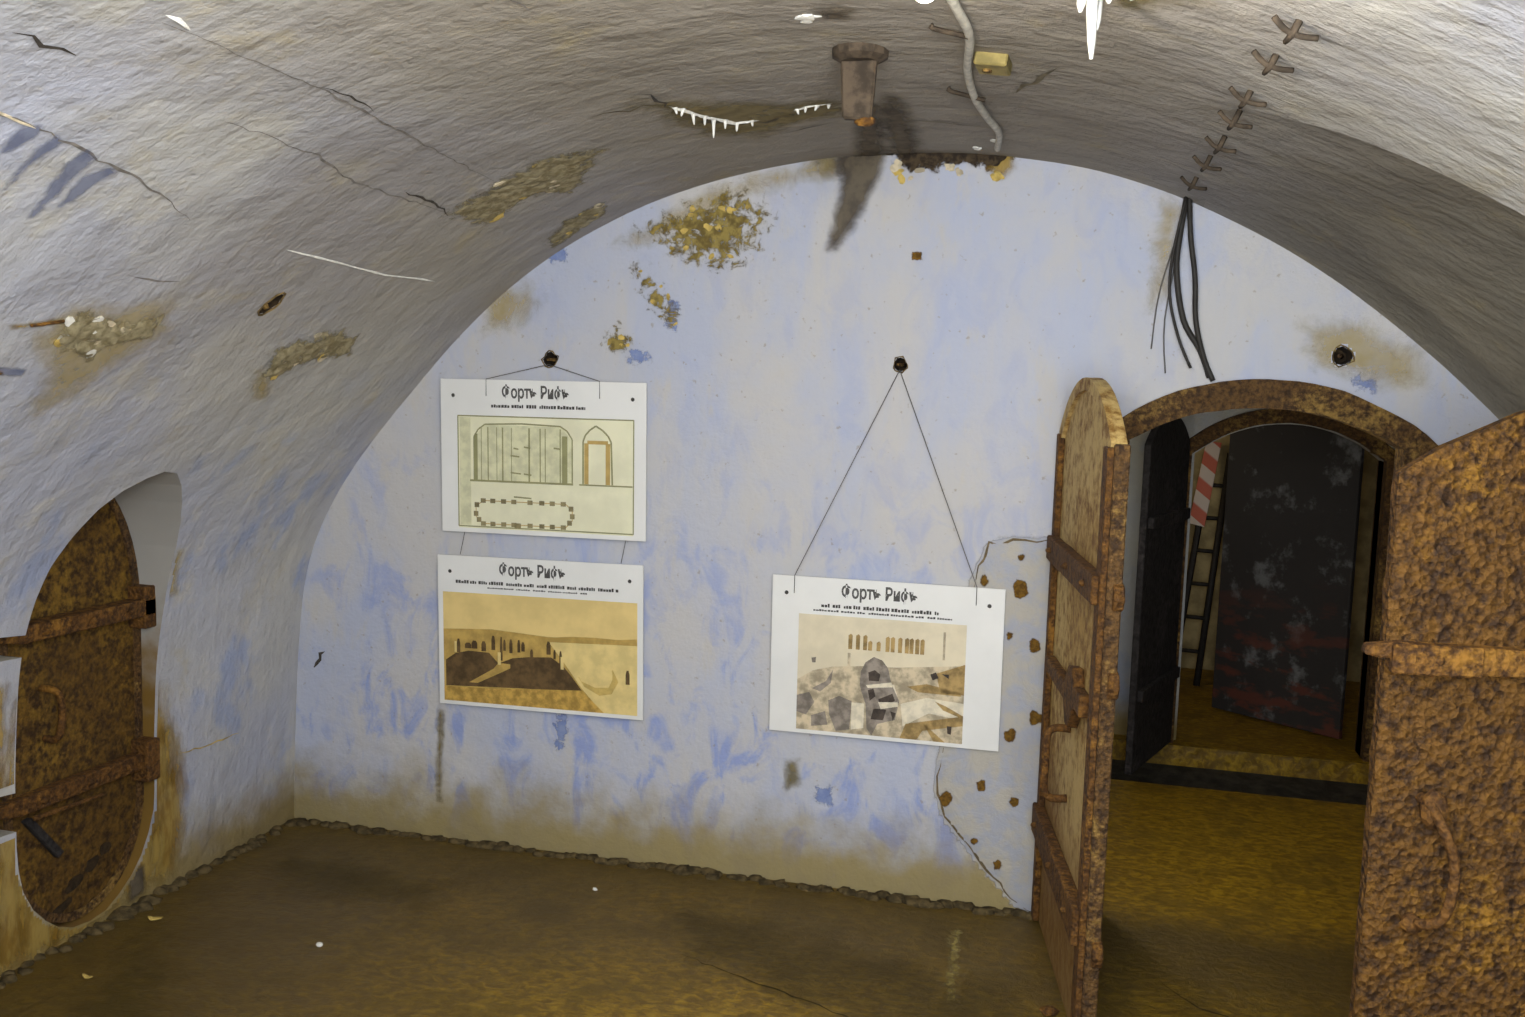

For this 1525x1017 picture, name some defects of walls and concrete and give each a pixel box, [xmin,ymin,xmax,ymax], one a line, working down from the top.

crack [16,33,76,56]
efflorescence [1077,0,1150,60]
crack [164,15,491,180]
crack [0,112,190,220]
crack [227,122,444,212]
peeling [406,149,606,224]
damp [806,97,917,247]
damp [638,190,773,274]
spalling [49,310,164,397]
peeling [258,329,358,394]